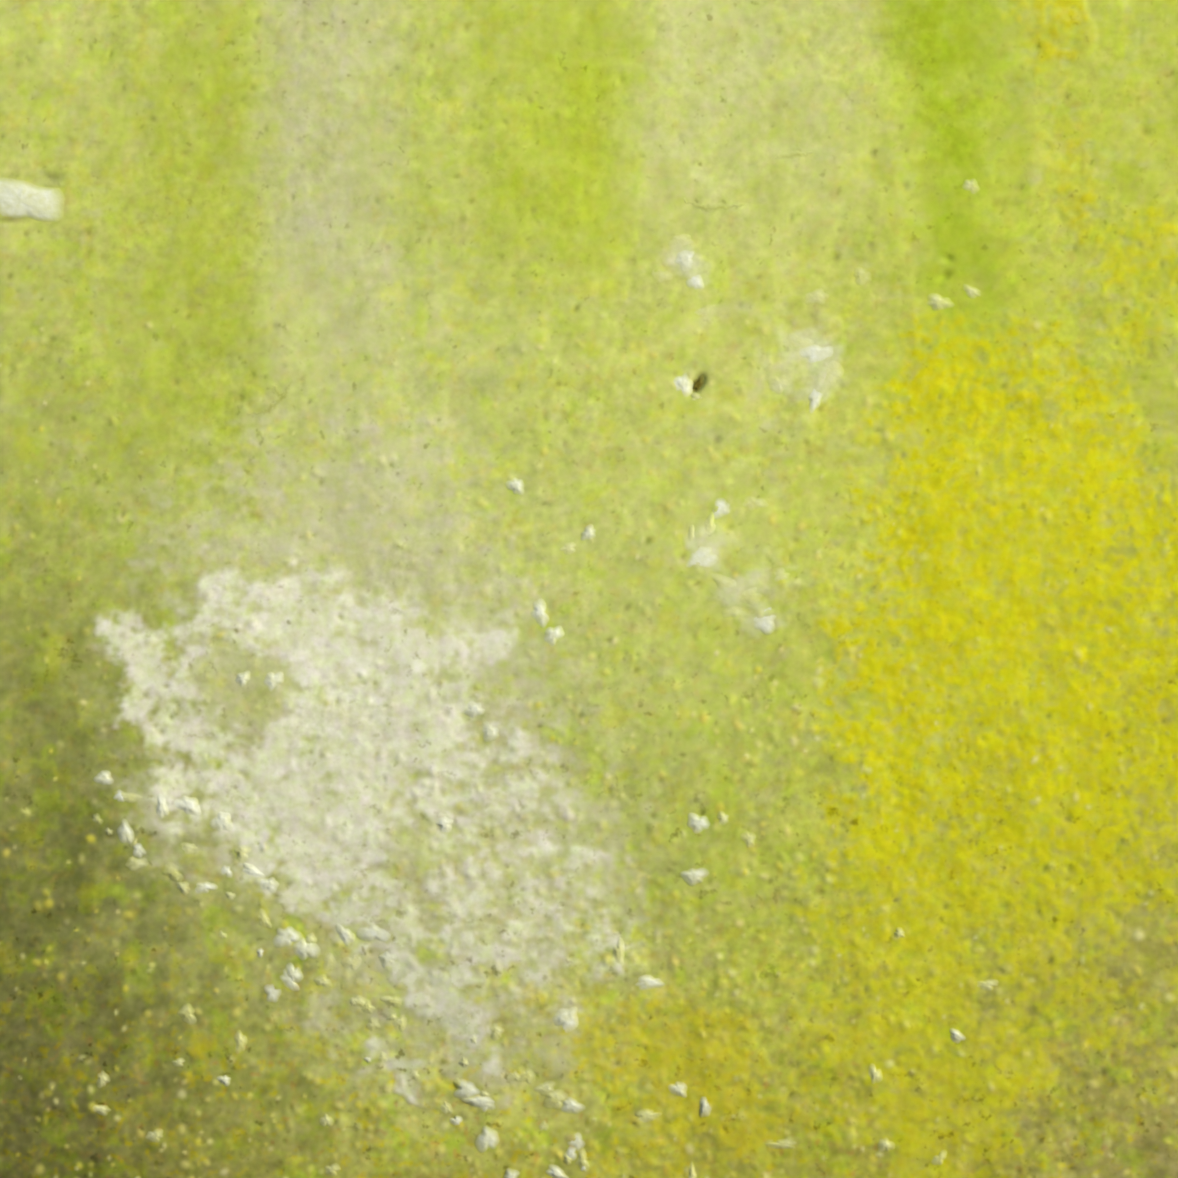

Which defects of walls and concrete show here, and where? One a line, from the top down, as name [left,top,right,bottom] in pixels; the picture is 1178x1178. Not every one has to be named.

water stain [72,0,691,1153]
water stain [324,1163,341,1177]
water stain [503,1168,520,1178]
water stain [545,1132,590,1178]